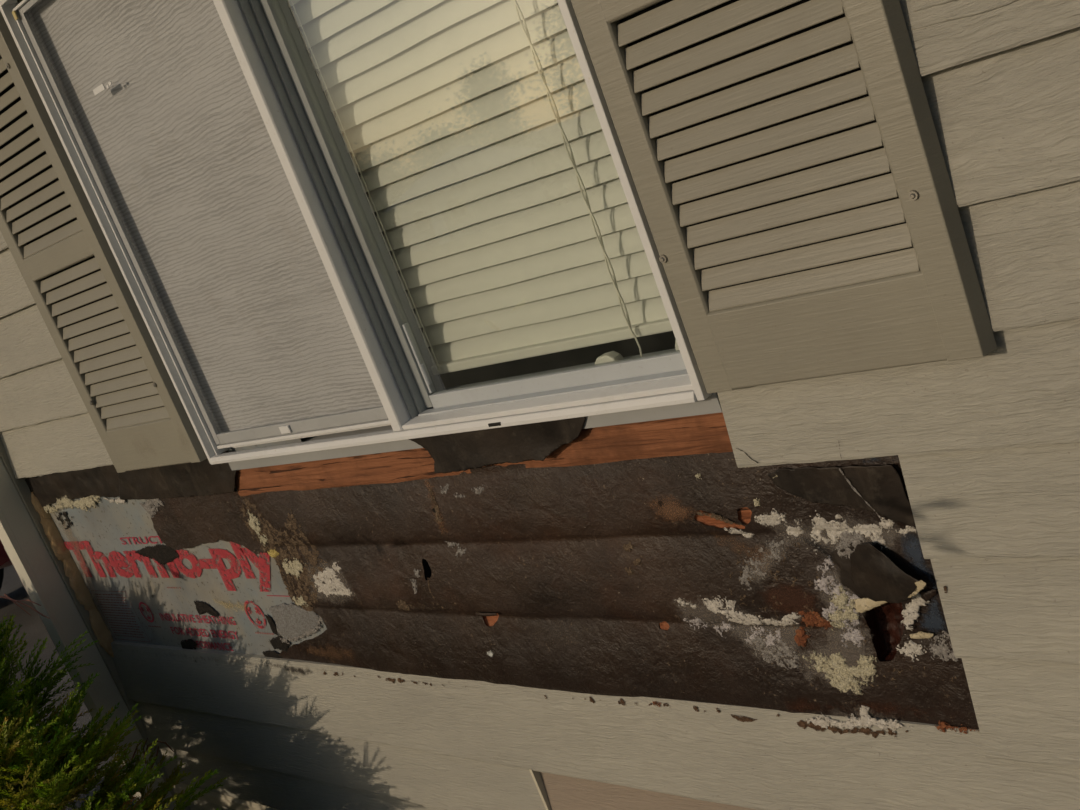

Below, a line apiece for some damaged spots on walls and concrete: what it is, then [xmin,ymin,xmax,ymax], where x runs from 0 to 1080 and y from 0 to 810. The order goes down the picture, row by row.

peeling [43,495,125,515]
peeling [139,498,165,518]
peeling [136,545,179,565]
peeling [236,496,352,658]
peeling [395,569,421,611]
peeling [194,601,218,618]
damp [764,585,815,626]
peeling [674,465,959,738]
peeling [180,639,198,649]